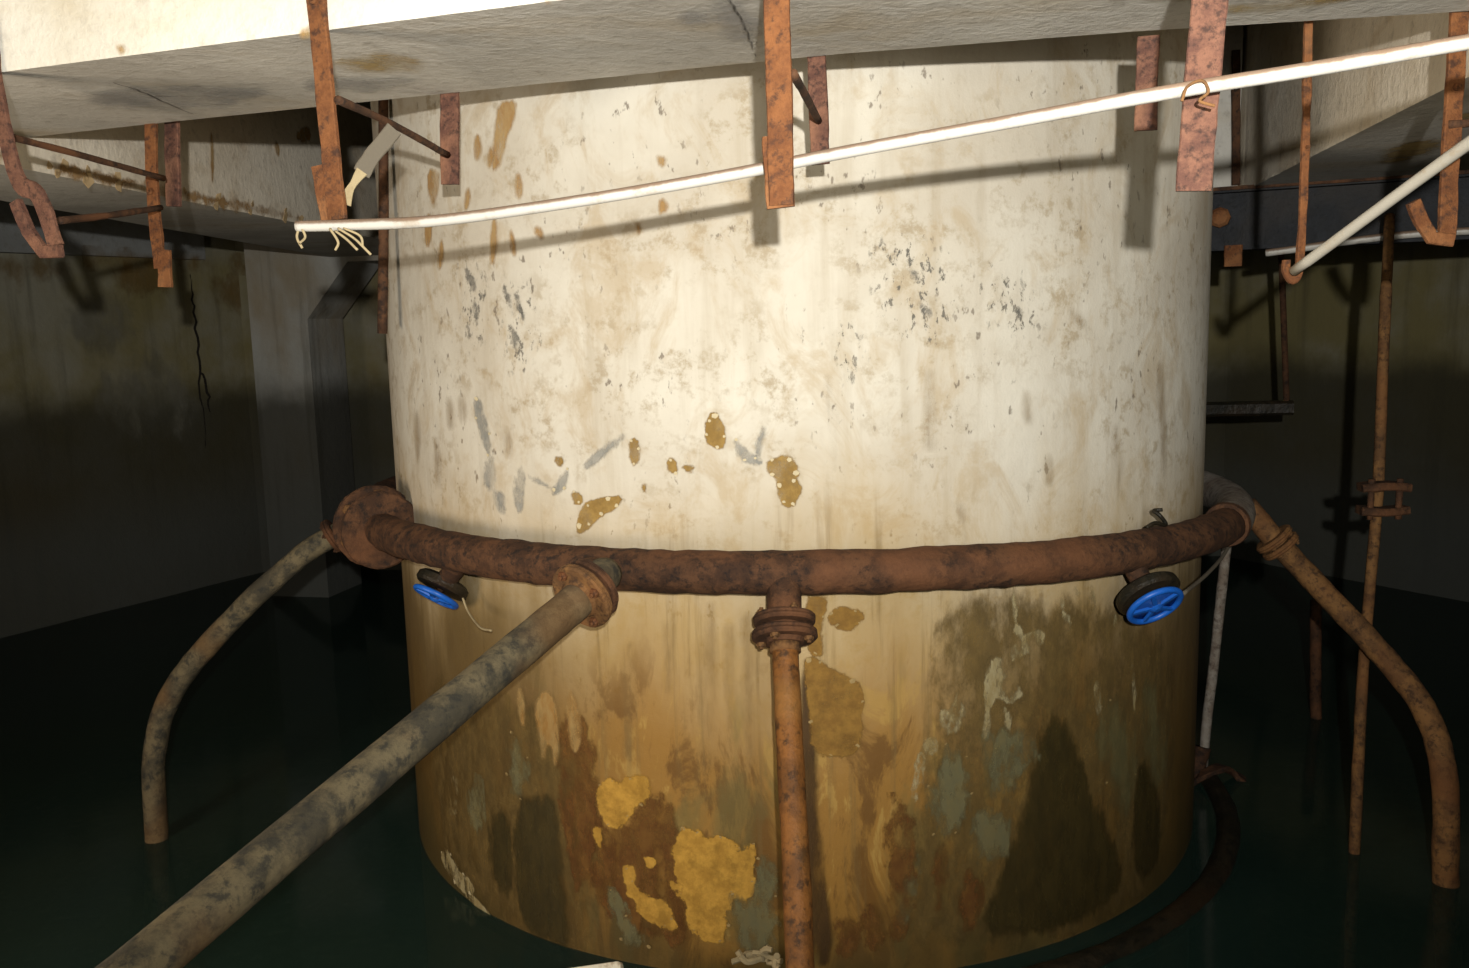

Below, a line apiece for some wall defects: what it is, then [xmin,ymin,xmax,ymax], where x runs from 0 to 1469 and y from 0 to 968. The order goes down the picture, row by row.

rust [475,101,515,169]
rust [490,220,516,262]
water stain [983,595,1045,739]
water stain [489,796,567,946]
rust [519,692,687,948]
rust [802,596,1173,965]
water stain [985,719,1160,936]